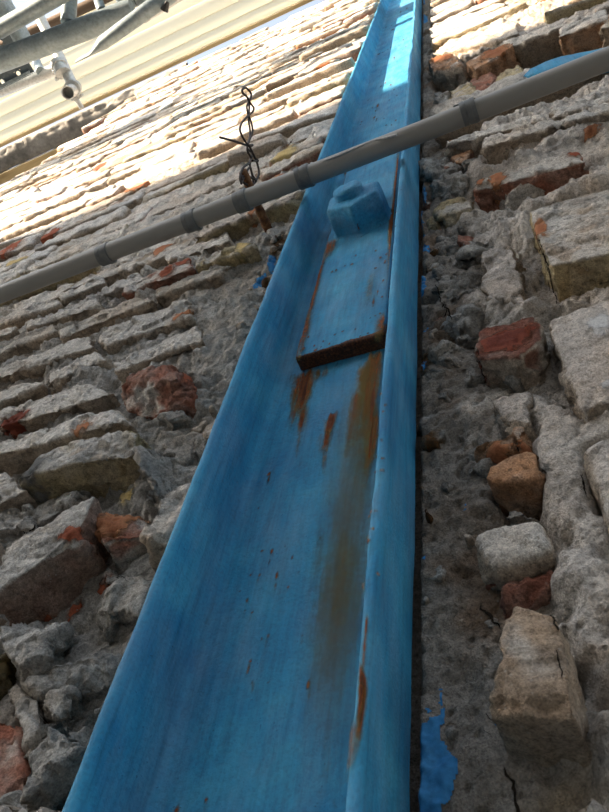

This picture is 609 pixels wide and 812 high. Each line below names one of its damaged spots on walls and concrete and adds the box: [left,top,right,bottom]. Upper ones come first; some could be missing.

corrosion [374,153,399,269]
corrosion [298,240,357,358]
crack [537,238,562,314]
corrosion [290,368,328,446]
corrosion [322,411,337,464]
corrosion [348,352,386,473]
crack [550,615,563,677]
corrosion [349,617,368,758]
crack [504,768,520,812]